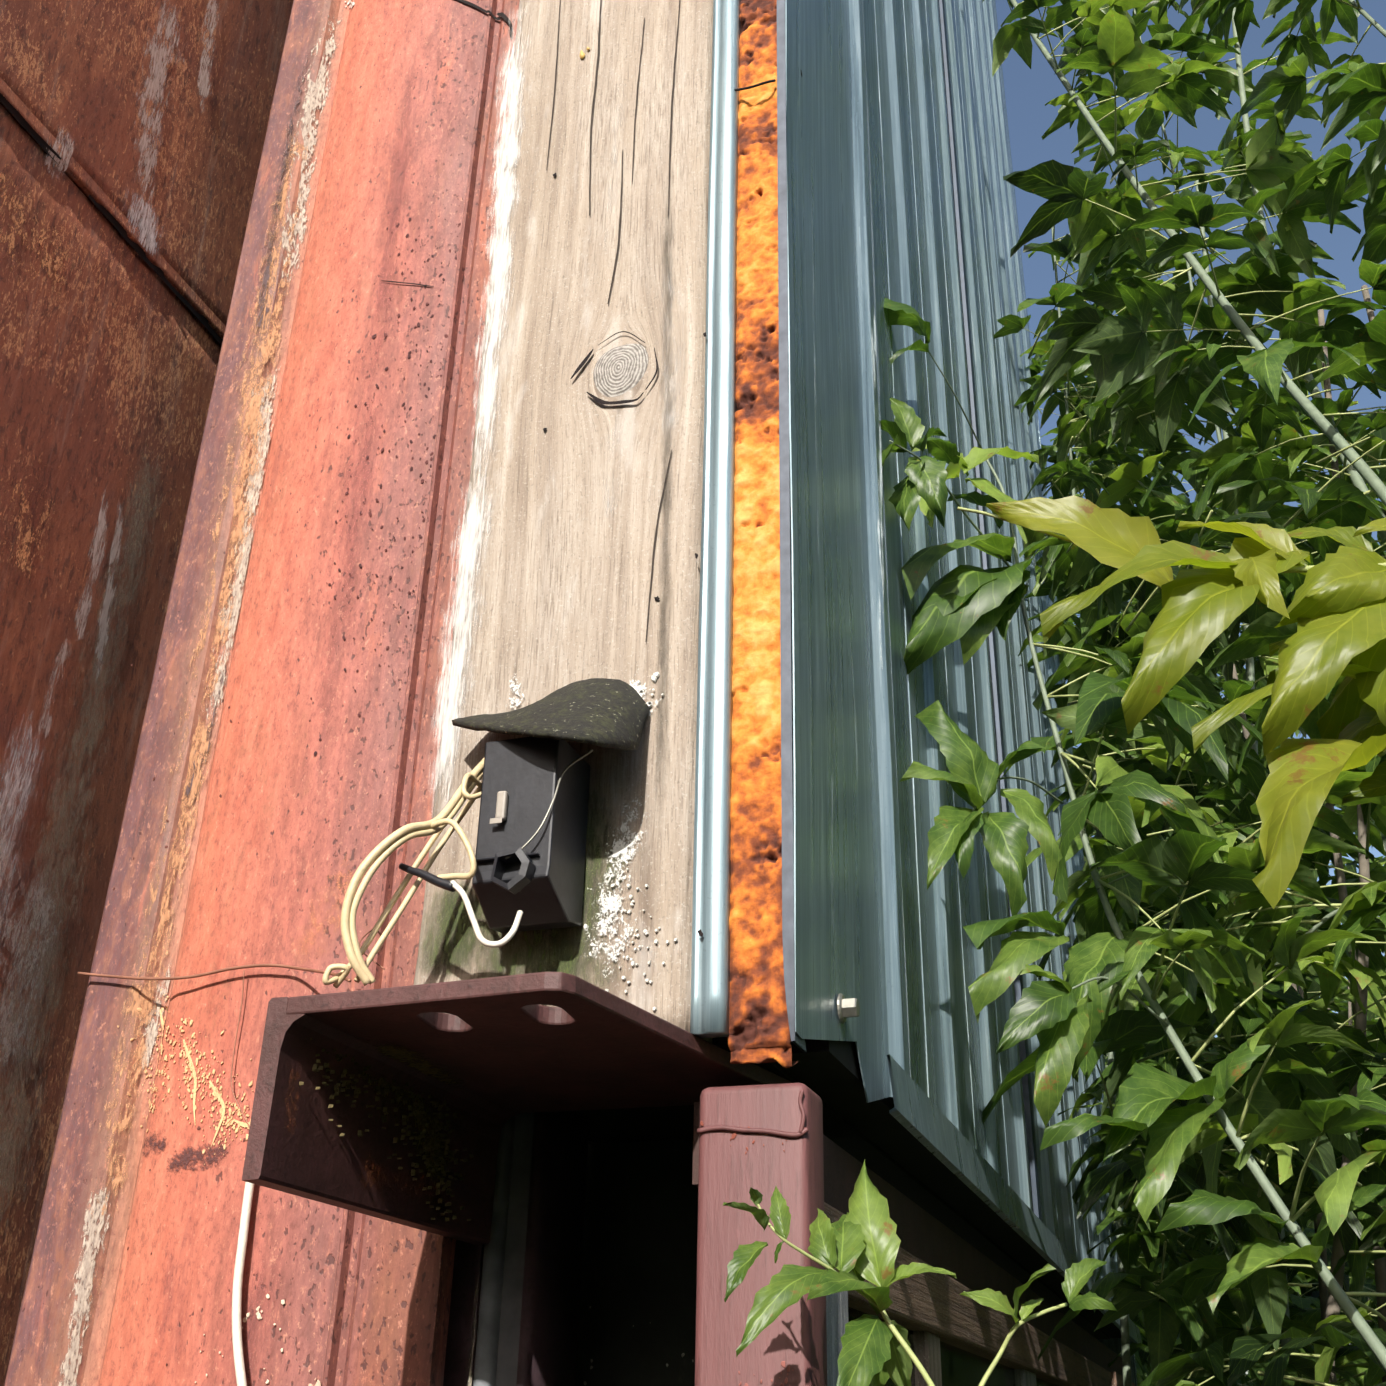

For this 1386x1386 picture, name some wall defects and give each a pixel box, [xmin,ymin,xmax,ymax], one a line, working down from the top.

water stain [197,0,219,106]
water stain [45,129,74,176]
water stain [129,1,184,255]
corrosion [0,164,88,304]
water stain [434,30,524,797]
corrosion [0,477,60,579]
water stain [0,495,123,1061]
corrosion [143,1131,228,1172]